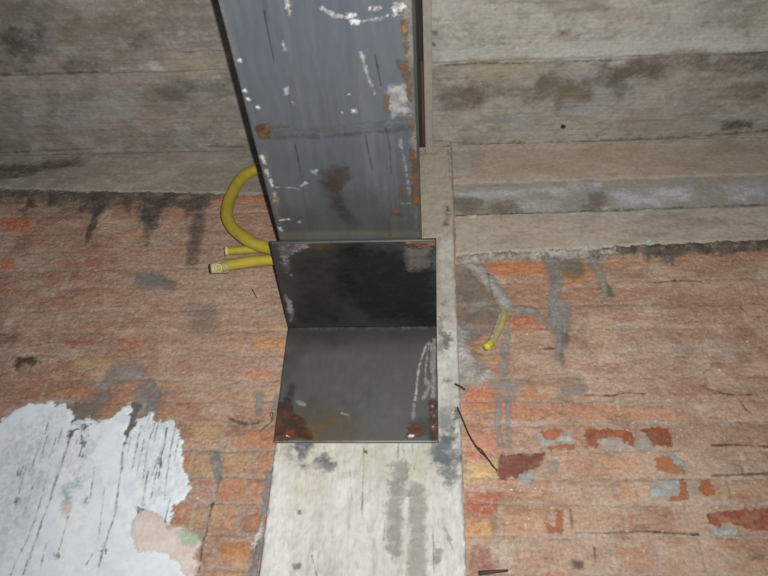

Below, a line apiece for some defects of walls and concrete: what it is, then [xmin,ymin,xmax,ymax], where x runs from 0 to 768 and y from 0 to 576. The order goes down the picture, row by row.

corrosion [397,61,412,102]
water stain [537,77,591,107]
corrosion [255,124,290,138]
corrosion [409,149,419,206]
water stain [86,205,104,242]
corrosion [275,398,312,441]
corrosion [407,400,438,441]
flaking render [0,400,201,576]